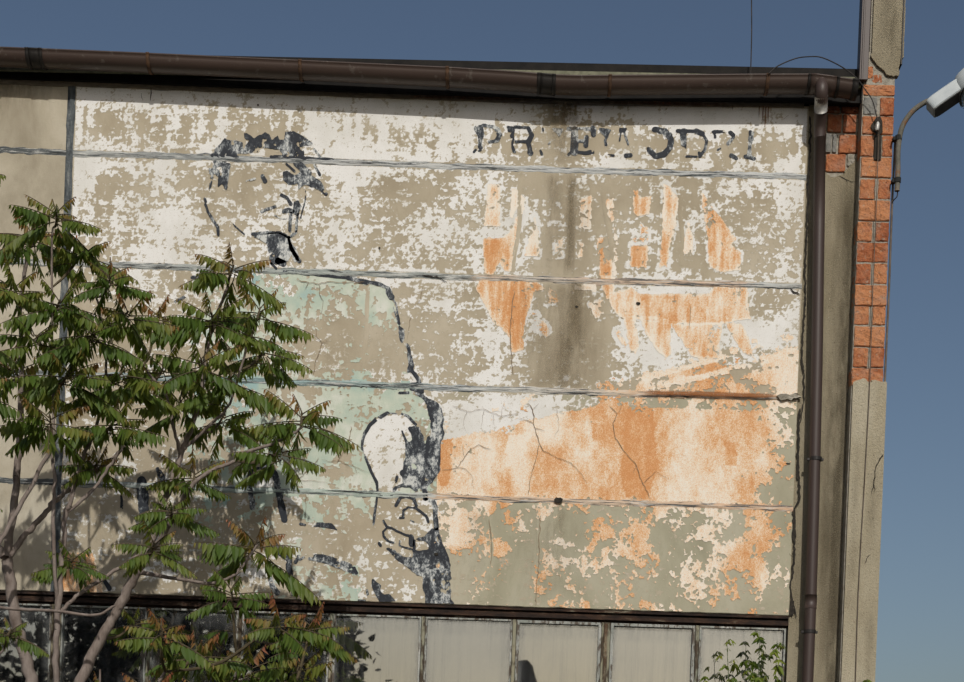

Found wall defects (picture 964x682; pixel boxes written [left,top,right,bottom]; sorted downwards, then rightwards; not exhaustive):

peeling [60,86,808,614]
crack [445,400,586,493]
crack [611,407,665,496]
spalling [825,66,895,389]